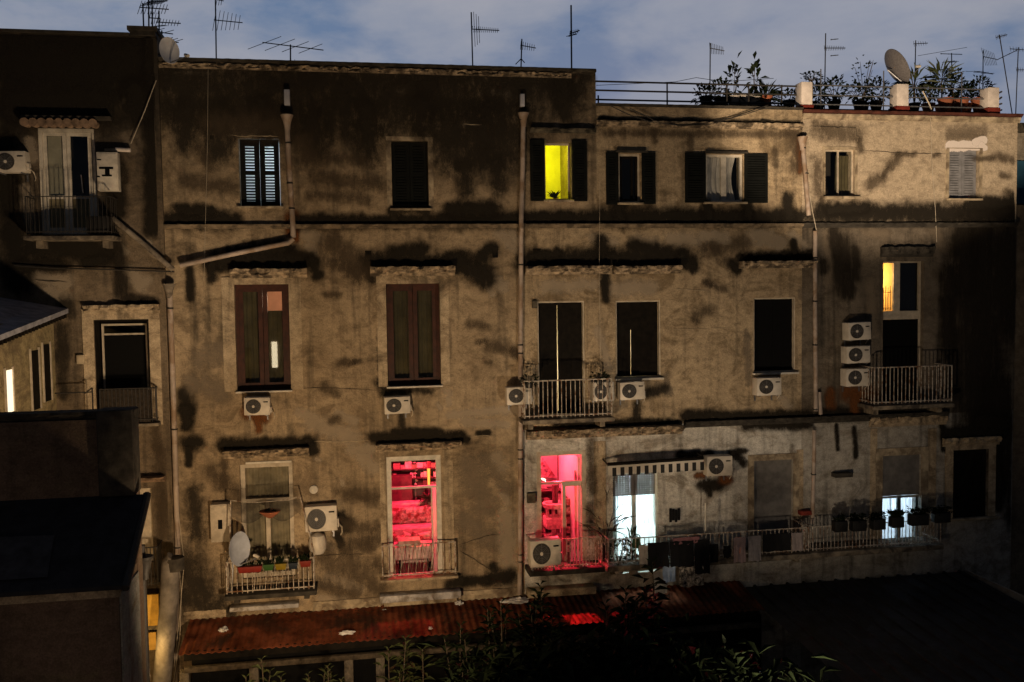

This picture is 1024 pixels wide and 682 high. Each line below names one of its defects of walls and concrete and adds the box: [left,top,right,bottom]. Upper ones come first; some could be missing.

peeling [945,125,988,152]
water stain [0,35,1016,539]
rust [240,408,269,434]